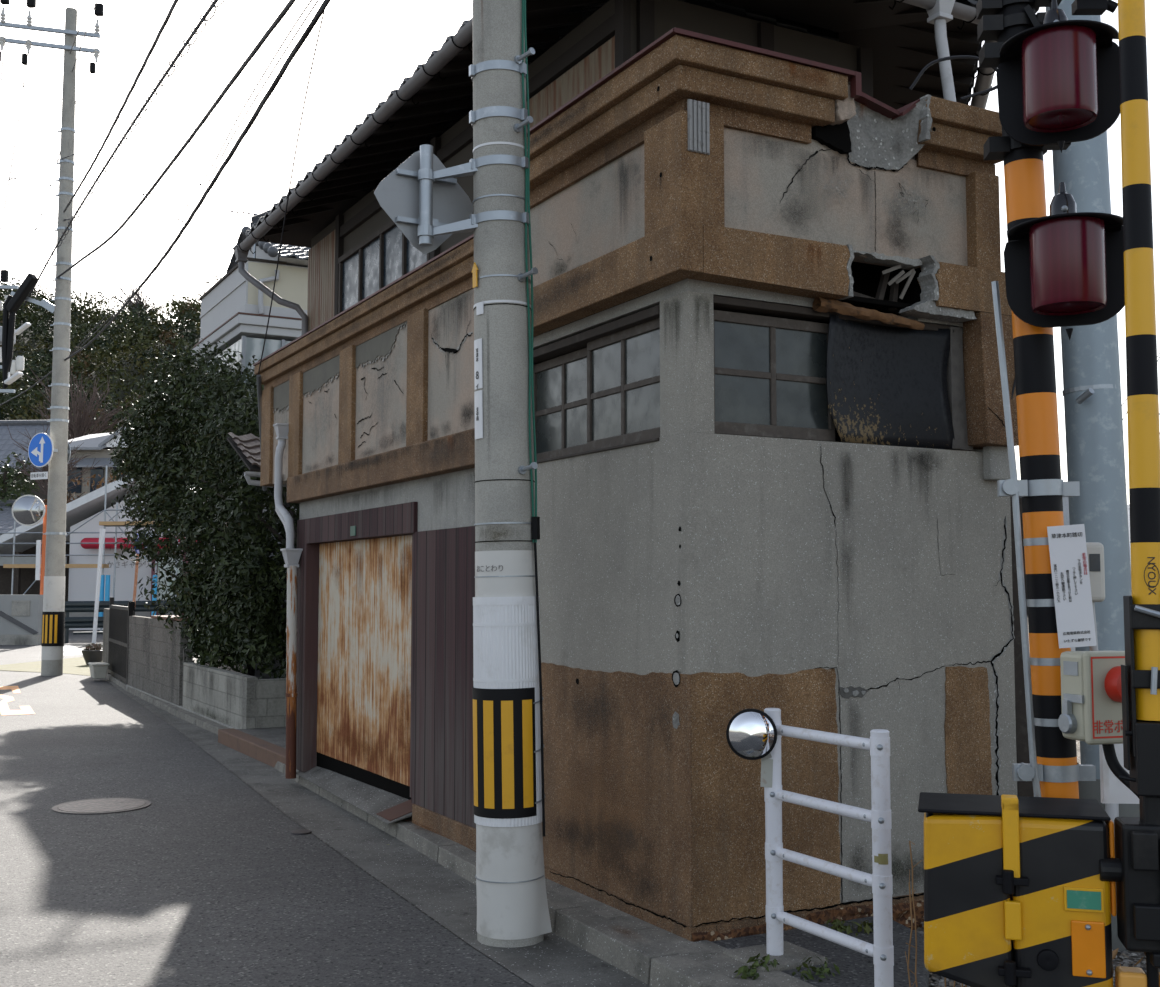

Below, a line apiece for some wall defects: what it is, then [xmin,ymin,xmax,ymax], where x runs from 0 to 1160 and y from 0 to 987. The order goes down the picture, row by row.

spalling [811,84,936,170]
crack [780,149,907,252]
peeling [303,355,340,404]
peeling [355,321,407,400]
crack [551,454,1015,930]